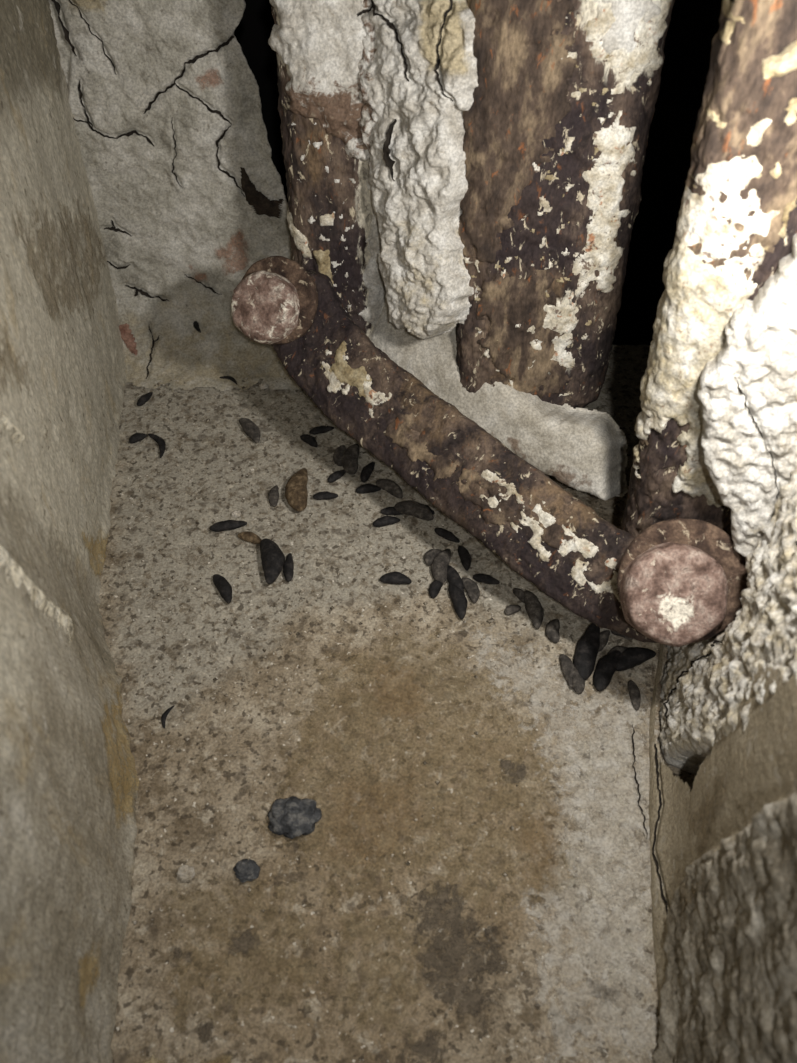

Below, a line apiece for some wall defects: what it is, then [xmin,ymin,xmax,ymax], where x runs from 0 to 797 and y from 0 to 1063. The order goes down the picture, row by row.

crack [51,0,117,75]
crack [73,36,245,197]
spalling [234,0,313,259]
spalling [612,0,723,346]
crack [104,220,131,236]
peeling [320,213,335,226]
crack [107,261,169,301]
crack [185,274,222,295]
crack [146,325,159,379]
damp [473,631,659,1063]
damp [406,884,507,1033]
damp [402,1030,446,1063]